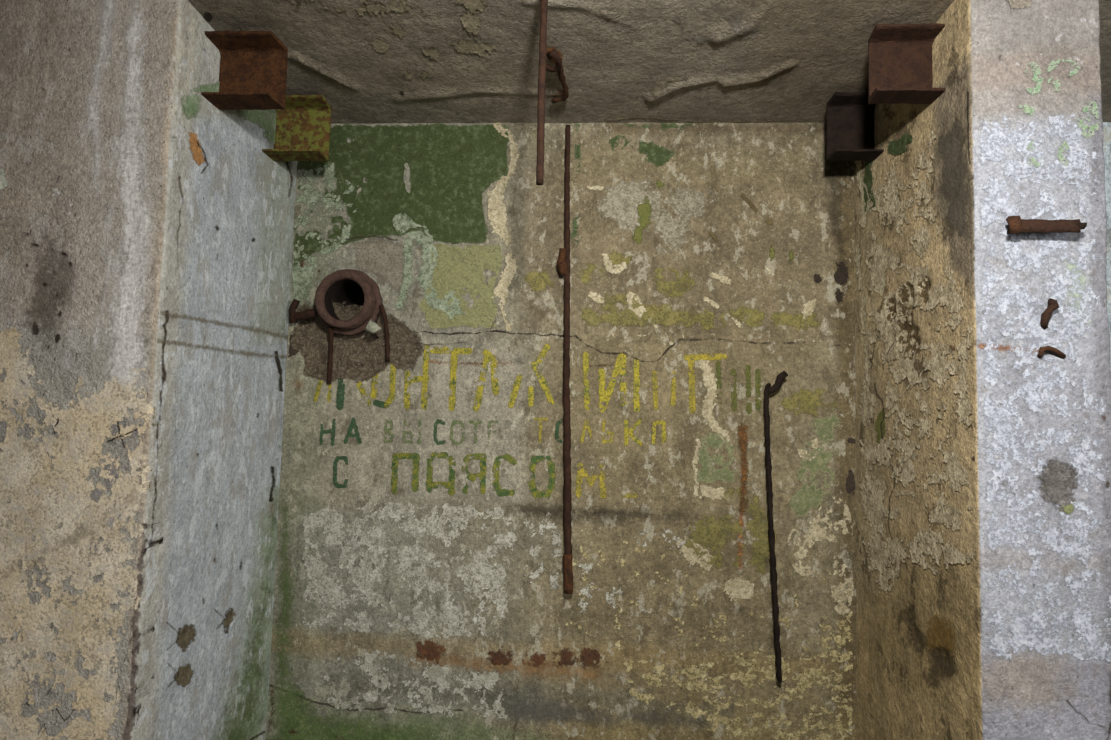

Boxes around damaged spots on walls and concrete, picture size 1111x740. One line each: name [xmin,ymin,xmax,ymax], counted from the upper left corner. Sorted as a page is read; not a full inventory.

peeling [0,322,158,740]
corrosion [413,639,446,666]
corrosion [486,647,608,668]
peeling [288,59,1111,740]